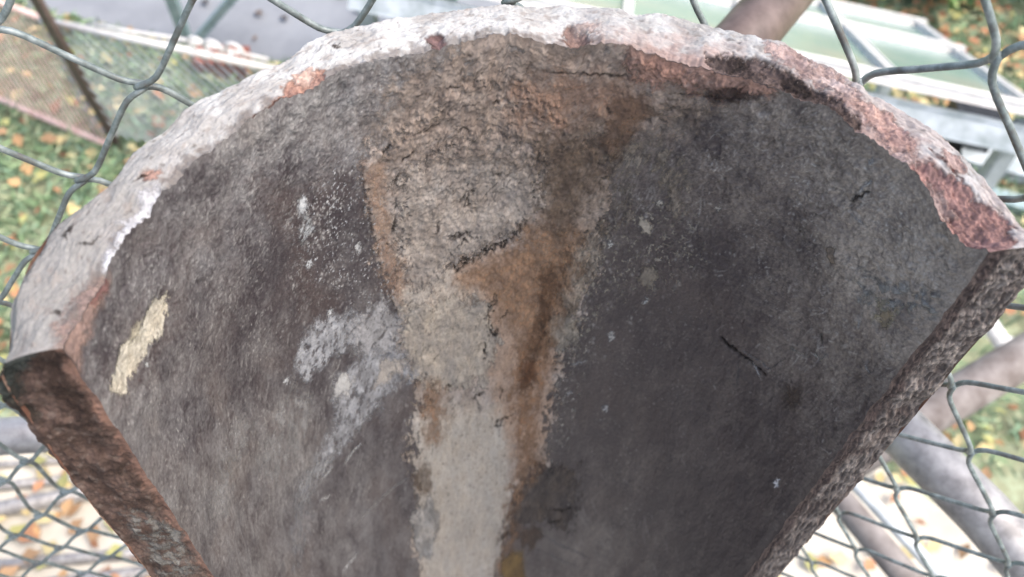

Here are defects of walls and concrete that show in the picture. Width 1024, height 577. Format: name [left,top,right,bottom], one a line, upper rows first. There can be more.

spalling [0,278,214,577]
efflorescence [259,299,416,523]
corrosion [421,383,441,443]
crack [451,228,521,272]
corrosion [459,128,617,577]